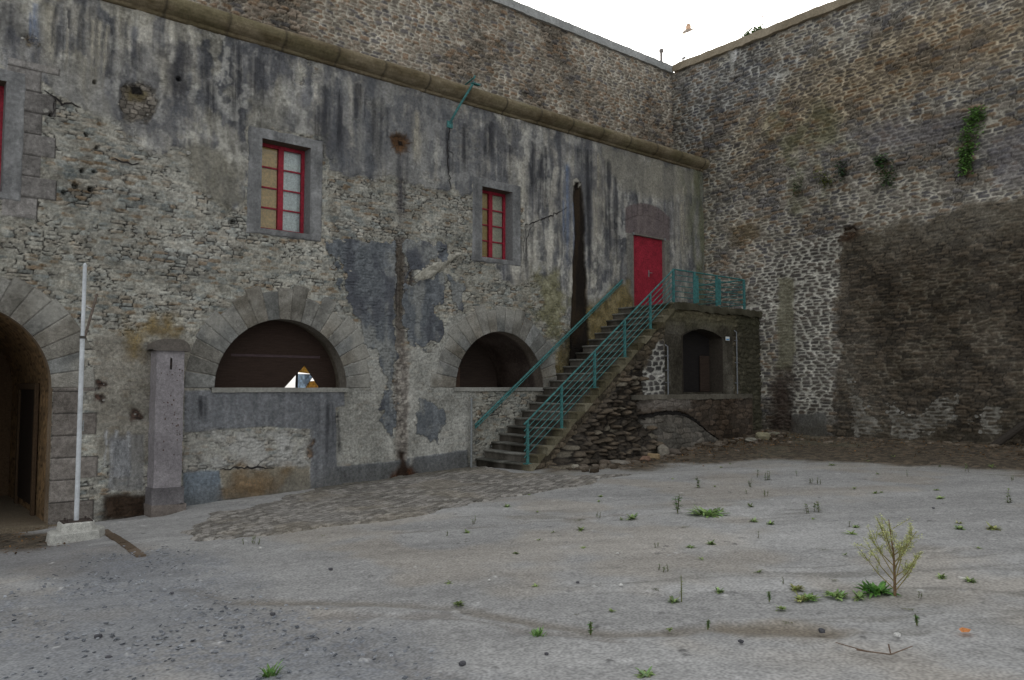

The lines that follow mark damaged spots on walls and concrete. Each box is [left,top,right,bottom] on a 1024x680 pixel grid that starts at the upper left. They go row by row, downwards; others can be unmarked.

crack [44,90,81,115]
rust [388,132,412,156]
peeling [42,81,245,288]
crack [523,207,567,261]
water stain [566,150,590,366]
crack [221,460,274,470]
rust [390,451,415,478]